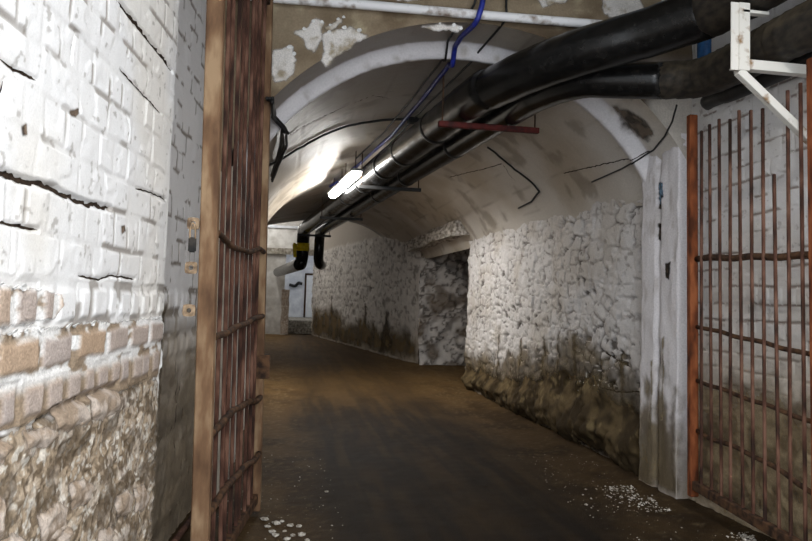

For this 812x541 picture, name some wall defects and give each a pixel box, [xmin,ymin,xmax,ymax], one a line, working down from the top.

peeling [539,0,567,8]
peeling [602,0,644,17]
peeling [272,45,296,82]
peeling [295,15,367,66]
crack [0,171,108,210]
leakage [312,297,415,356]
leakage [464,334,678,492]
leakage [698,378,812,541]